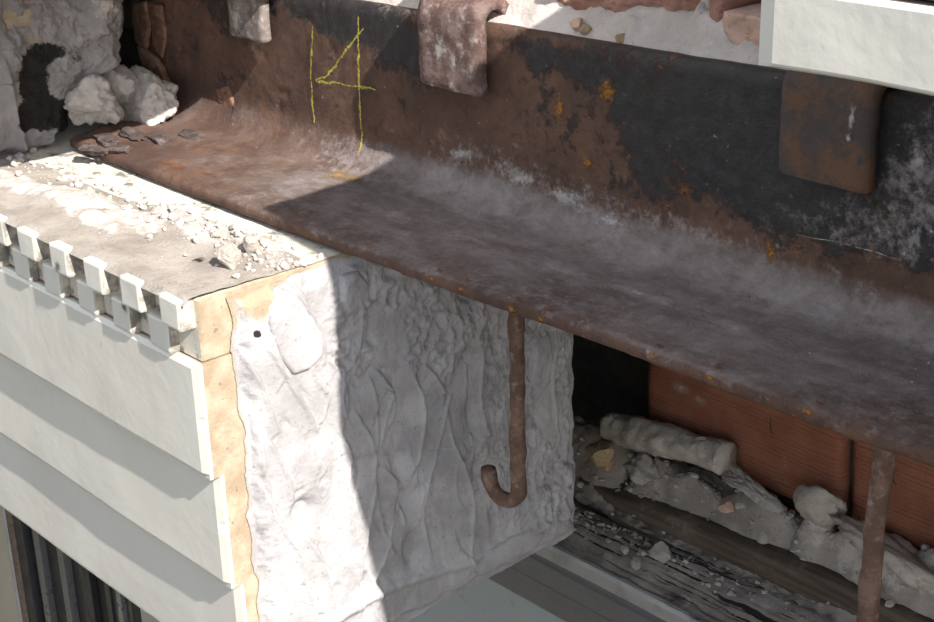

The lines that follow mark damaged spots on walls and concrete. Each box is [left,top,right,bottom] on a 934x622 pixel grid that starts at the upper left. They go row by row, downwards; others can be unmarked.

spalling [557,0,761,23]
corrosion [132,0,171,82]
corrosion [216,86,234,108]
corrosion [77,126,203,156]
damp [510,169,533,184]
damp [553,190,583,211]